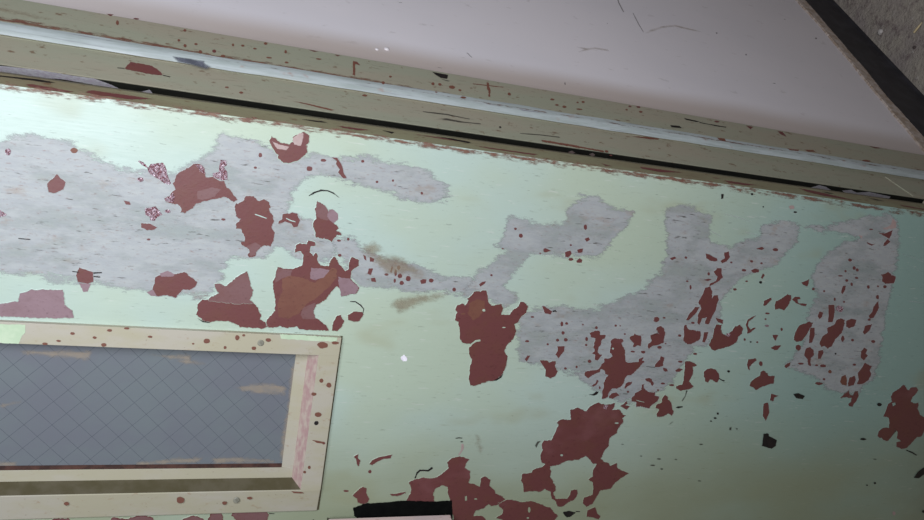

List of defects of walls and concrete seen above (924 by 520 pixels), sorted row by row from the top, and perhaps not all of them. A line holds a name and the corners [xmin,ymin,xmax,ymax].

peeling [859,218,896,246]
peeling [0,131,807,520]
peeling [784,258,896,407]
peeling [877,384,924,455]